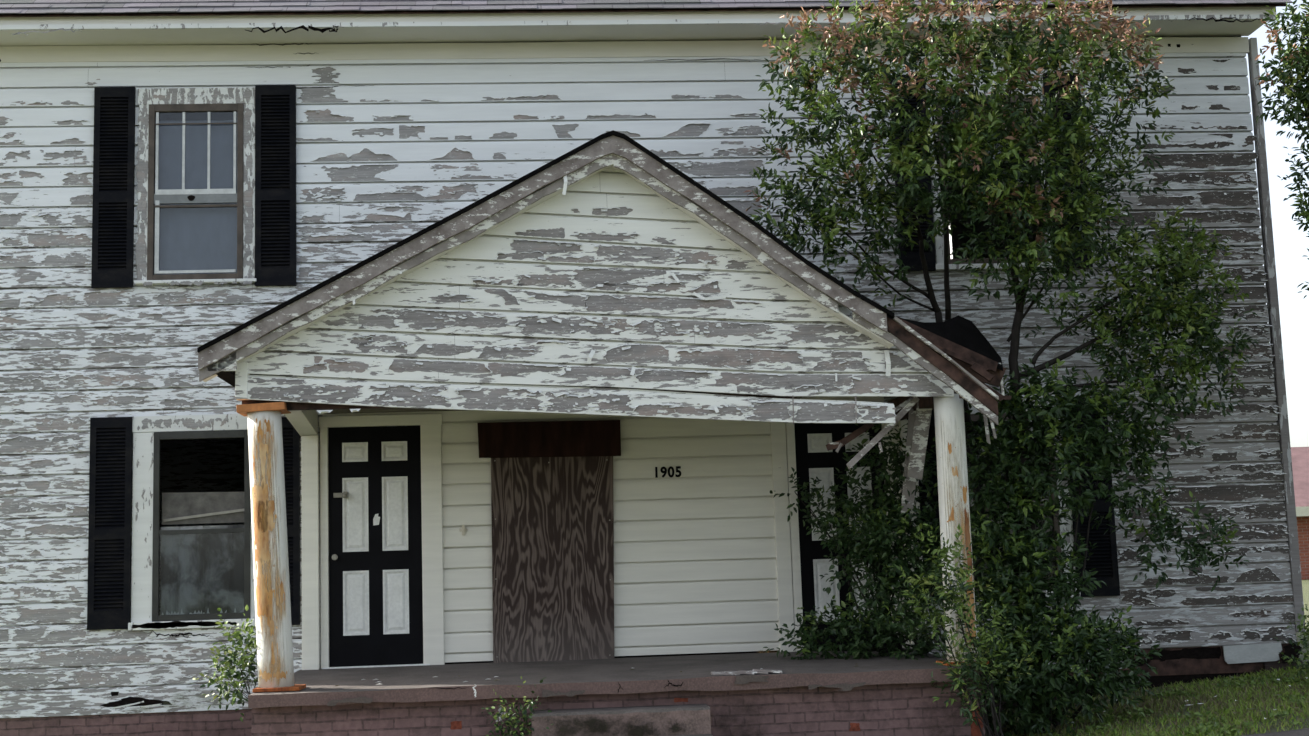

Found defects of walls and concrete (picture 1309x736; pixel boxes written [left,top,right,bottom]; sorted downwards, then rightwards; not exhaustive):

crack [246,25,339,89]
peeling [296,66,504,253]
peeling [481,94,656,160]
peeling [650,95,770,215]
peeling [1158,67,1196,93]
peeling [1181,85,1240,110]
peeling [0,94,254,687]
peeling [248,175,947,422]
peeling [1110,125,1301,663]
corrosion [252,418,289,683]
corrosion [947,442,976,645]